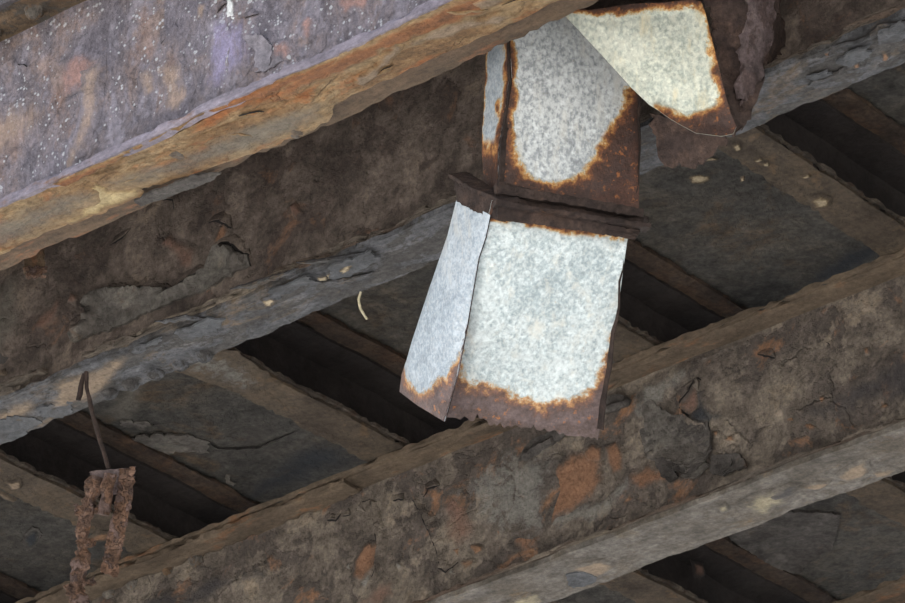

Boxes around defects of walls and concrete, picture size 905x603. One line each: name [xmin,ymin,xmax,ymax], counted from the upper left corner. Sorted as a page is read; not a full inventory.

corrosion [0,87,58,169]
corrosion [53,0,517,225]
corrosion [482,0,736,208]
peeling [806,44,872,87]
corrosion [399,312,670,523]
spalling [688,375,727,428]